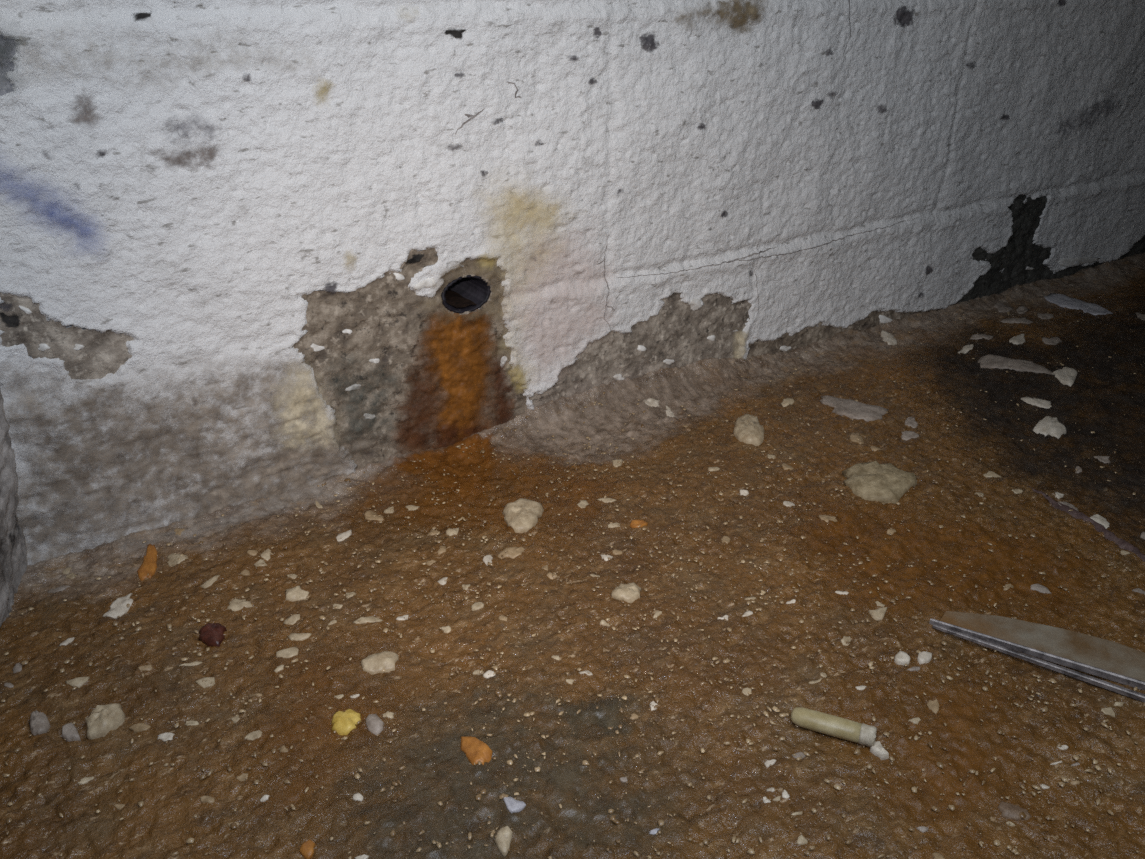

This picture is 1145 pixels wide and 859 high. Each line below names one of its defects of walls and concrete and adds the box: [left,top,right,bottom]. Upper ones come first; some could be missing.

peeling [952,195,1145,345]
peeling [0,292,134,380]
rust [368,314,597,528]
peeling [292,247,939,469]
peeling [958,334,994,354]
peeling [1021,396,1052,409]
peeling [1051,367,1078,387]